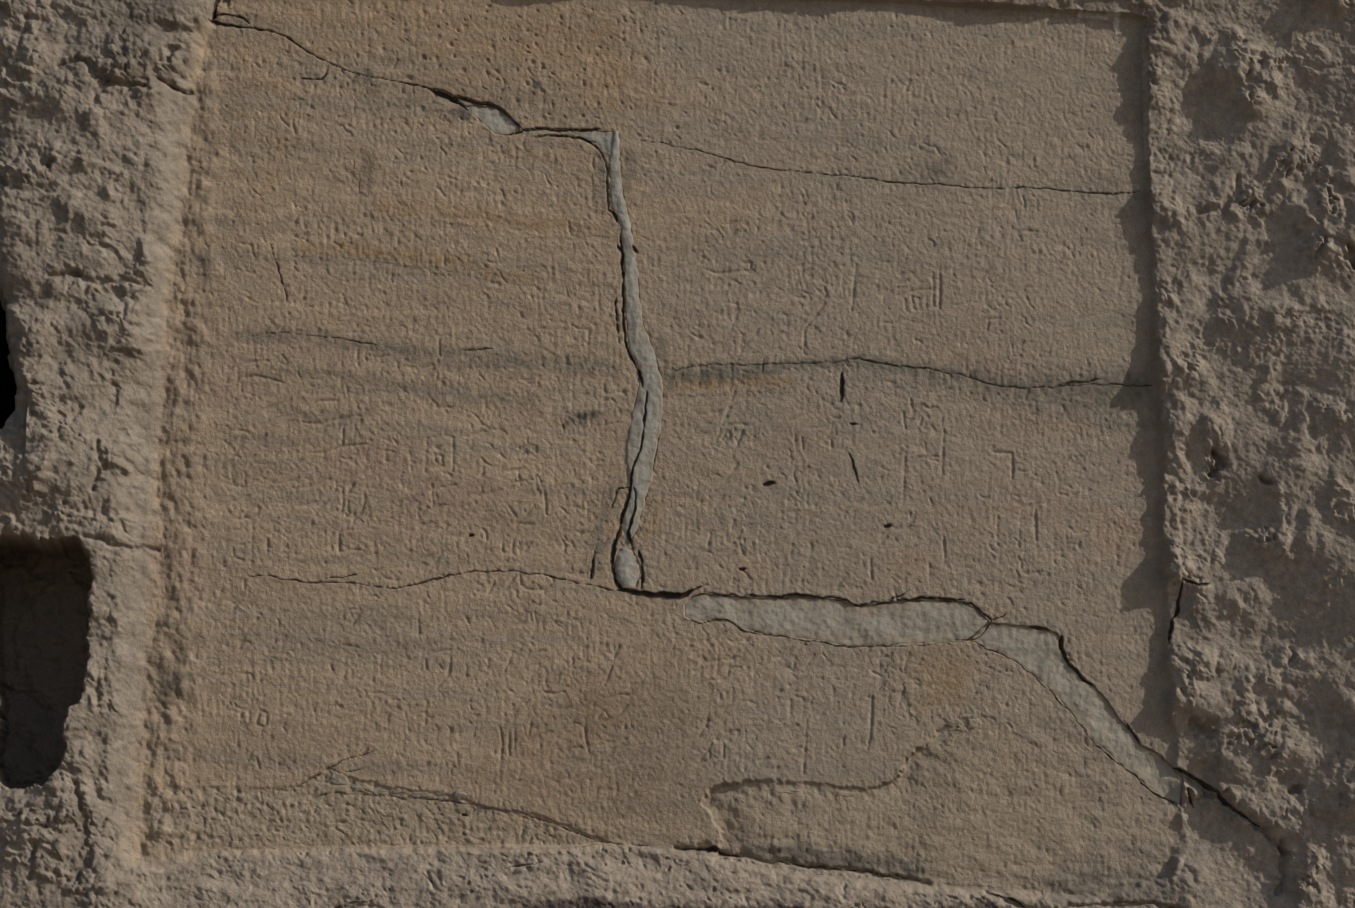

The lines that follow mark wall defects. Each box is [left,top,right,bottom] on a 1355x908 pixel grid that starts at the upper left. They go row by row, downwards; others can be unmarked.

crack [208,0,1262,828]